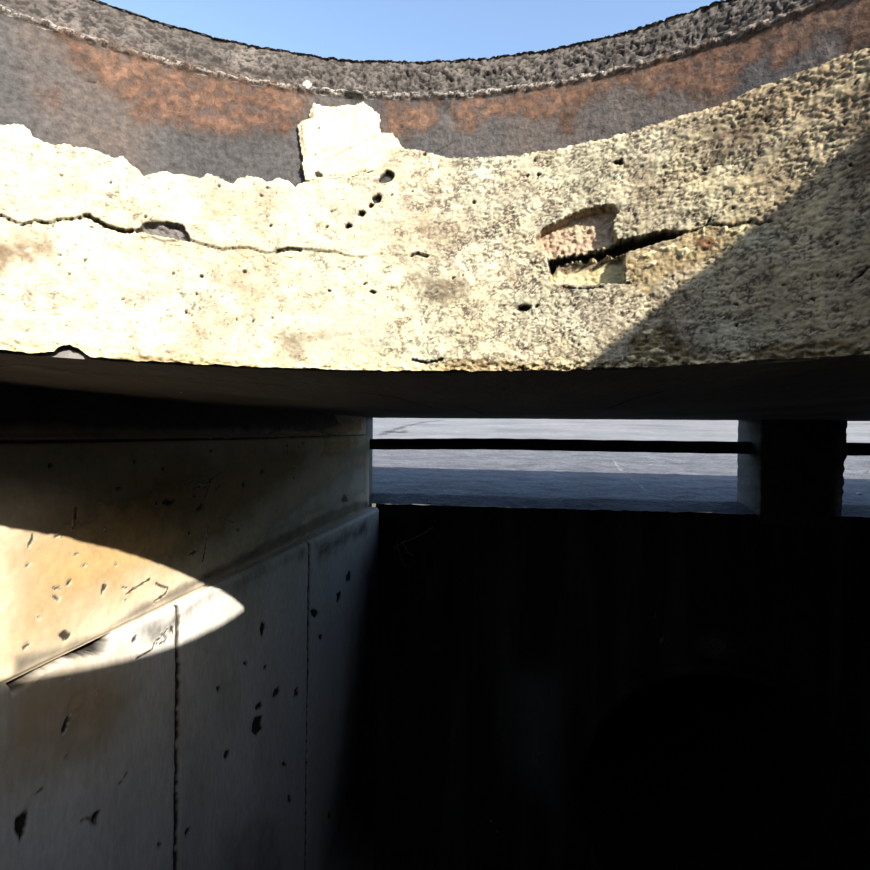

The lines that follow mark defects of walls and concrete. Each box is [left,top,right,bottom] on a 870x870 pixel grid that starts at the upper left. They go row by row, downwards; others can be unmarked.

rust [388,102,437,133]
crack [0,214,138,234]
spalling [138,222,190,245]
spalling [536,207,772,289]